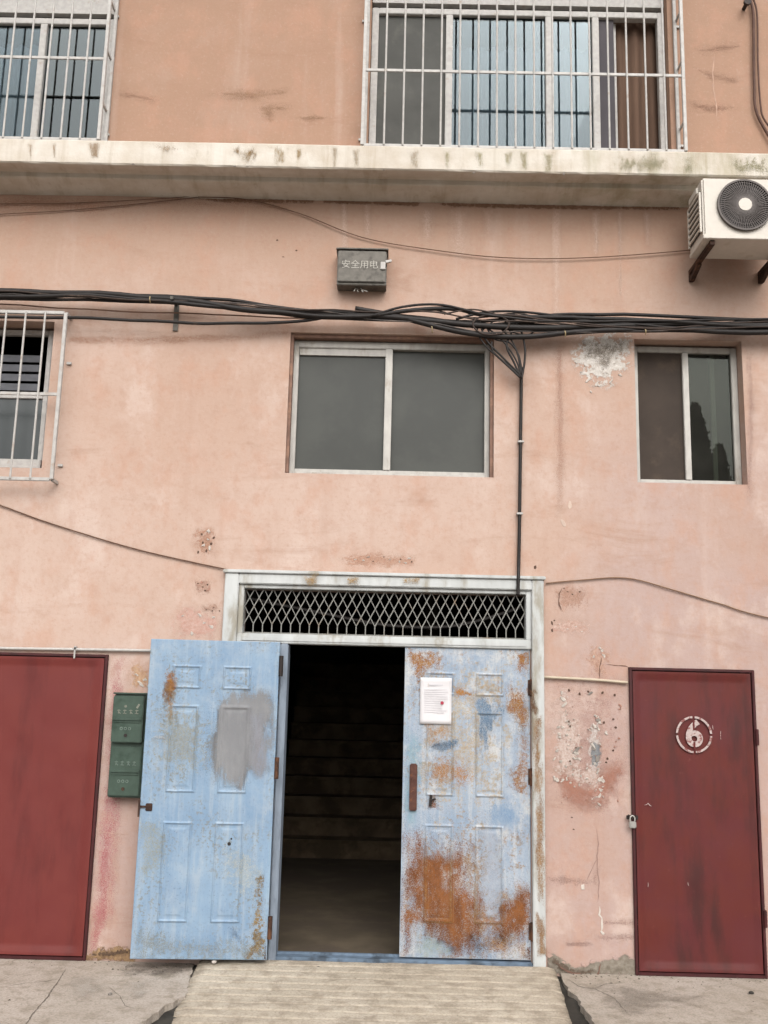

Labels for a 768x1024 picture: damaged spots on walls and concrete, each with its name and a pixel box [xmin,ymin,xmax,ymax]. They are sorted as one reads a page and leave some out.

damp [614,154,668,174]
damp [730,155,768,177]
peeling [570,333,634,393]
spalling [192,527,215,556]
rust [162,667,178,708]
peeling [545,646,628,830]
rust [400,648,548,960]
crack [587,835,600,898]
rust [244,875,266,959]